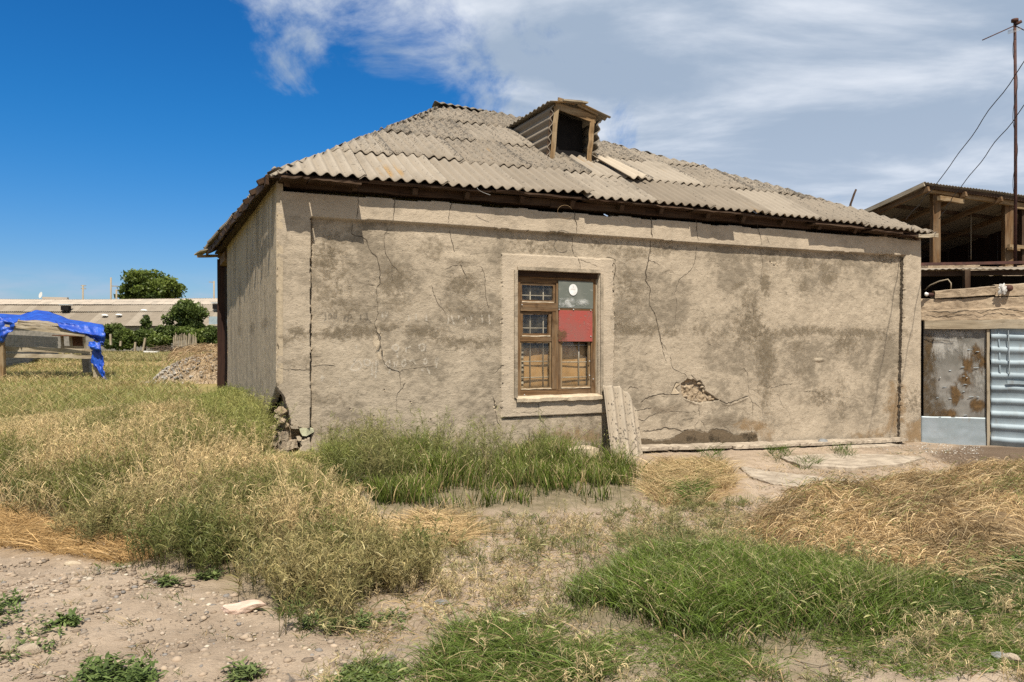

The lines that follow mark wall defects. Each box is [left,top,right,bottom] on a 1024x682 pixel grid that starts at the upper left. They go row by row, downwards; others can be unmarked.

crack [352,197,430,406]
crack [630,220,845,441]
spalling [671,379,715,402]
rust [923,336,986,417]
water stain [641,420,770,445]